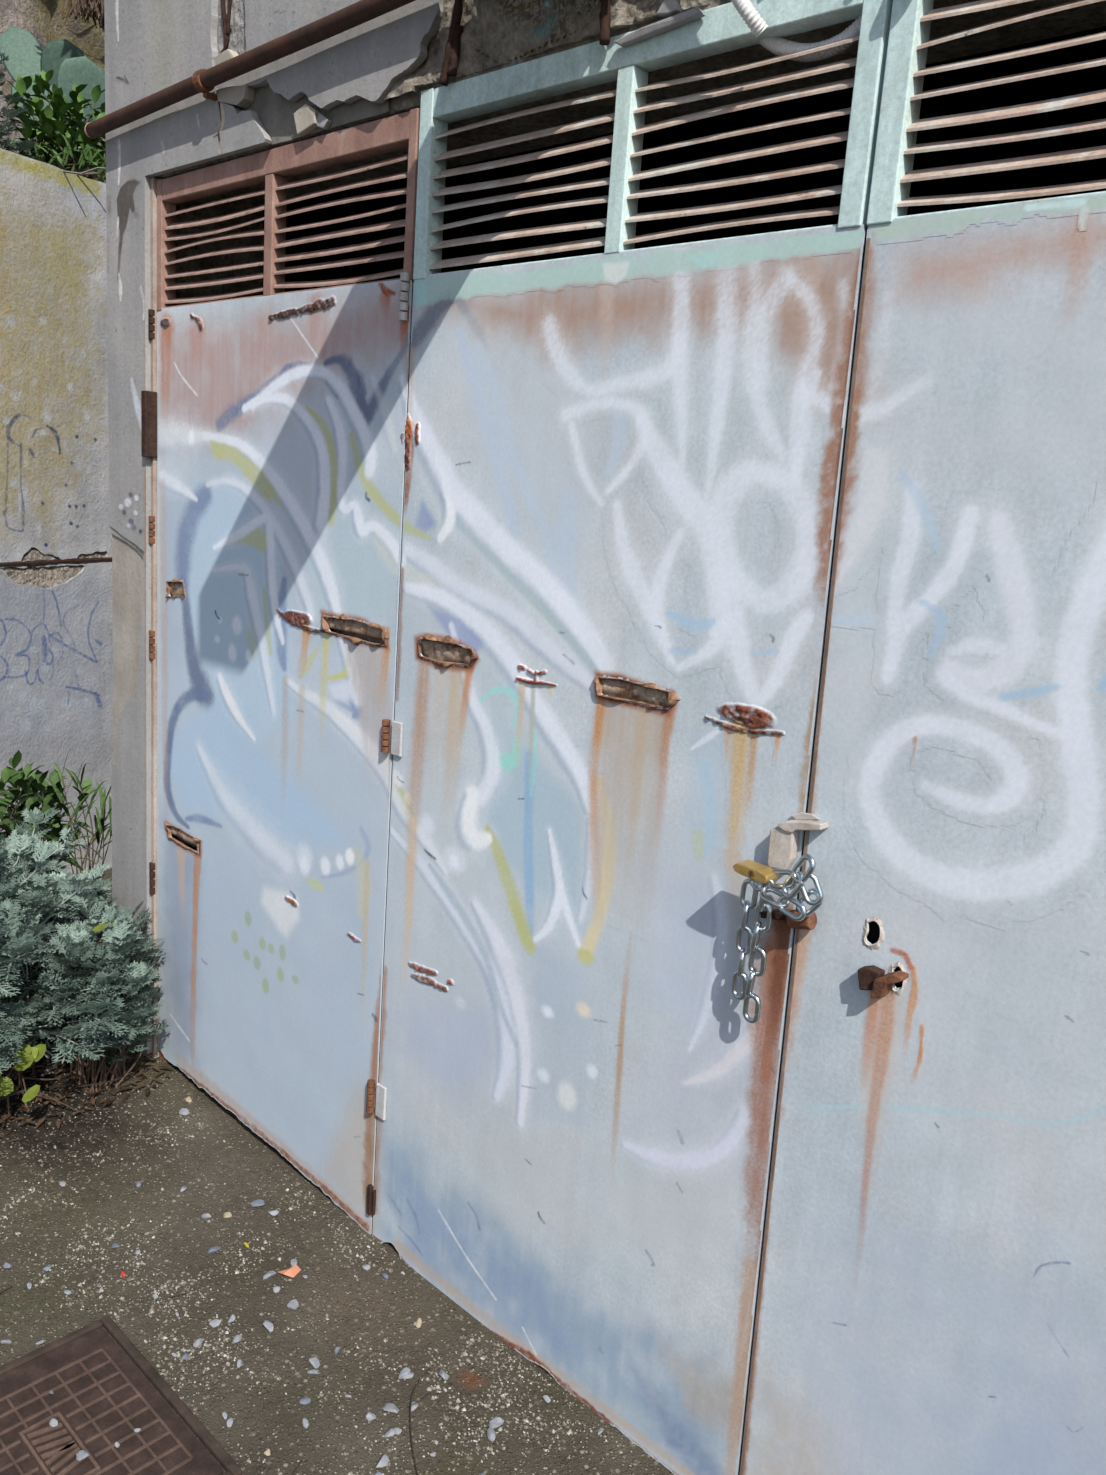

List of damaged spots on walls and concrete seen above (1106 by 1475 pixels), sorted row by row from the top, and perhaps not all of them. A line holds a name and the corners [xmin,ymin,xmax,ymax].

spalling [214,0,723,146]
rust [438,278,663,381]
rust [808,212,1106,610]
spalling [0,454,112,605]
peeling [118,491,142,535]
rust [513,663,558,796]
rust [158,476,483,1282]
rust [584,667,682,1200]
rust [705,675,826,1475]
rust [851,944,926,1298]
rust [485,1325,681,1475]